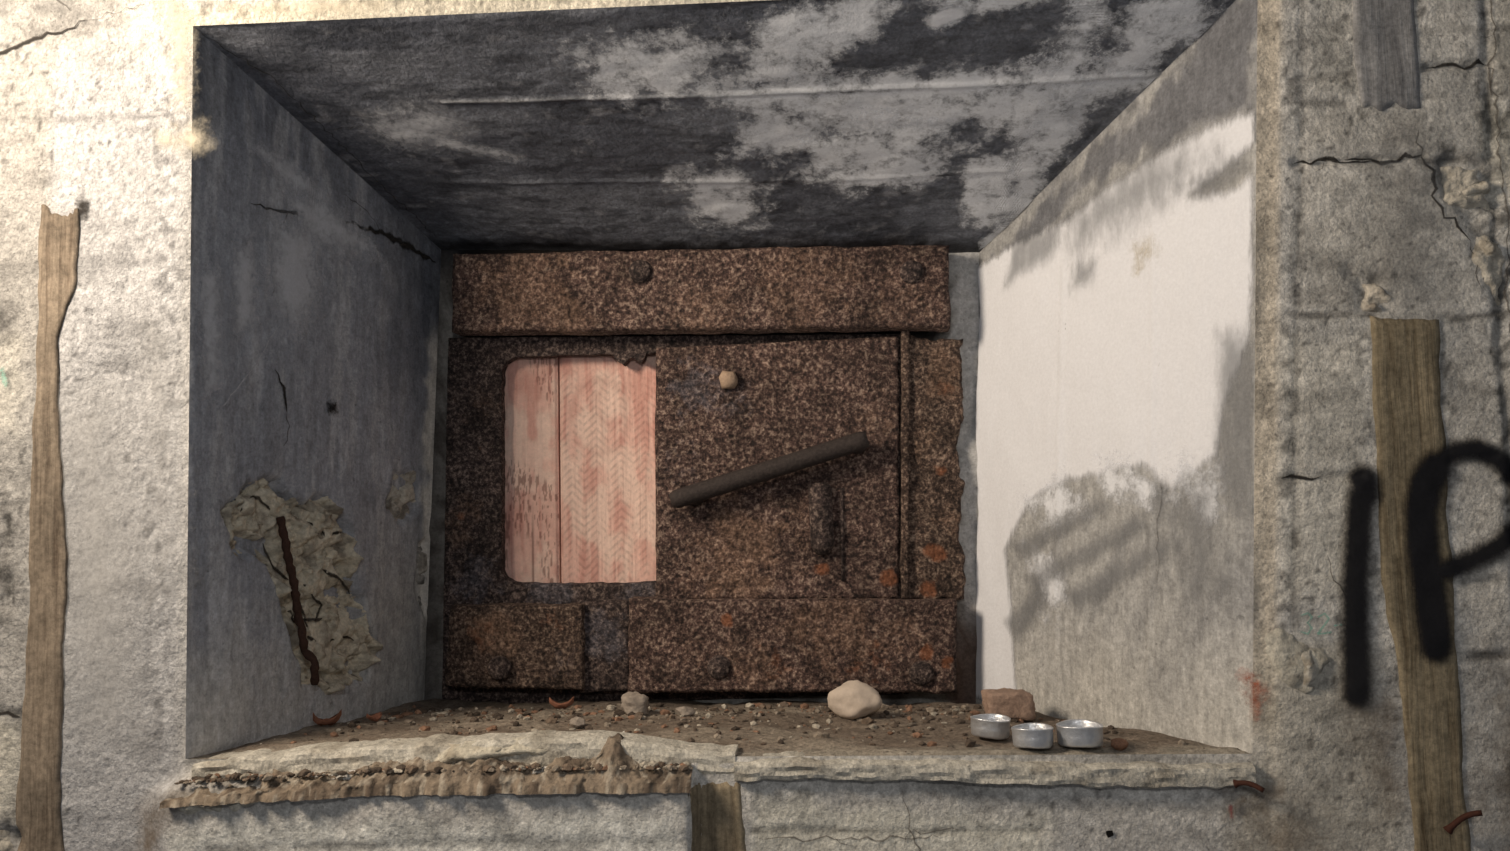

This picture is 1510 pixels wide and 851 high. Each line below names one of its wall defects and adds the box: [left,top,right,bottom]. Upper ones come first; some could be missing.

crack [0,0,144,54]
damp [439,139,516,158]
crack [1294,0,1510,332]
spalling [220,478,383,695]
crack [0,710,20,718]